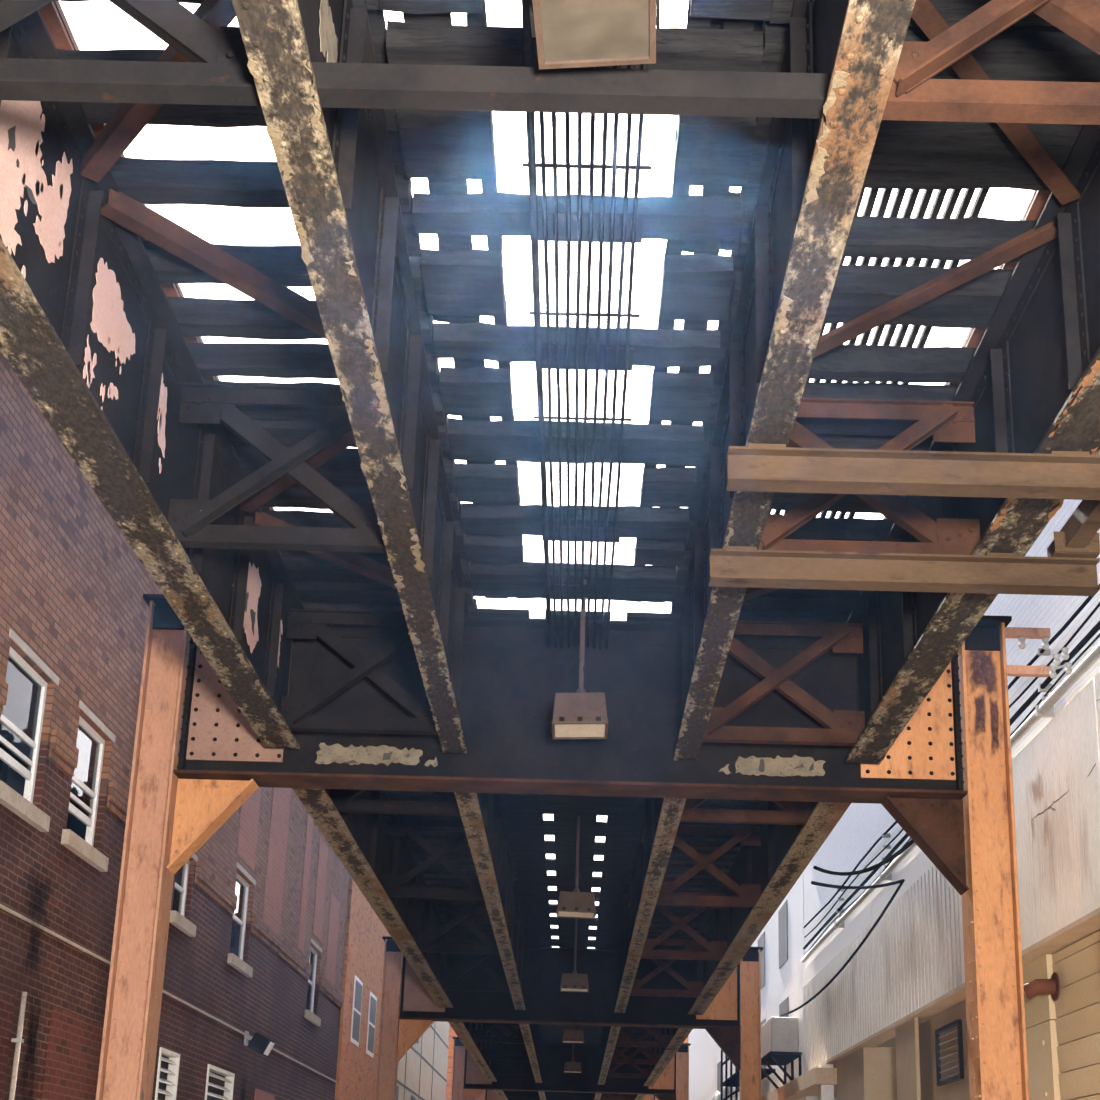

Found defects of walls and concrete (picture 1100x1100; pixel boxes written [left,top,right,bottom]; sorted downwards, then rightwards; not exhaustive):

peeling [0,100,73,263]
peeling [83,258,135,409]
rust [1048,360,1100,438]
rust [990,498,1015,530]
peeling [177,550,198,581]
peeling [179,618,206,655]
peeling [206,562,262,665]
peeling [255,679,297,746]
rust [970,650,999,753]
peeling [315,743,438,767]
peeling [719,755,826,777]